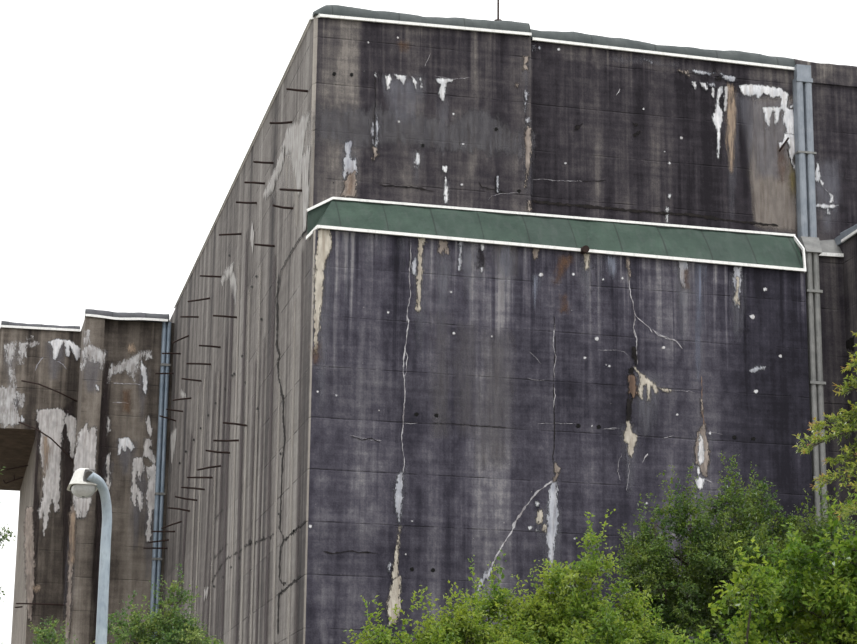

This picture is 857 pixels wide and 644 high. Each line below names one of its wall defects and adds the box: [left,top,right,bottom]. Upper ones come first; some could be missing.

peeling [434,75,469,102]
damp [750,97,797,231]
peeling [0,330,152,428]
peeling [24,407,156,644]
damp [179,242,280,644]
crack [204,228,307,634]
damp [287,252,303,644]
crack [323,236,508,627]
crack [475,317,573,599]
crack [604,257,682,364]
spalling [618,346,695,490]
spalling [693,423,719,490]